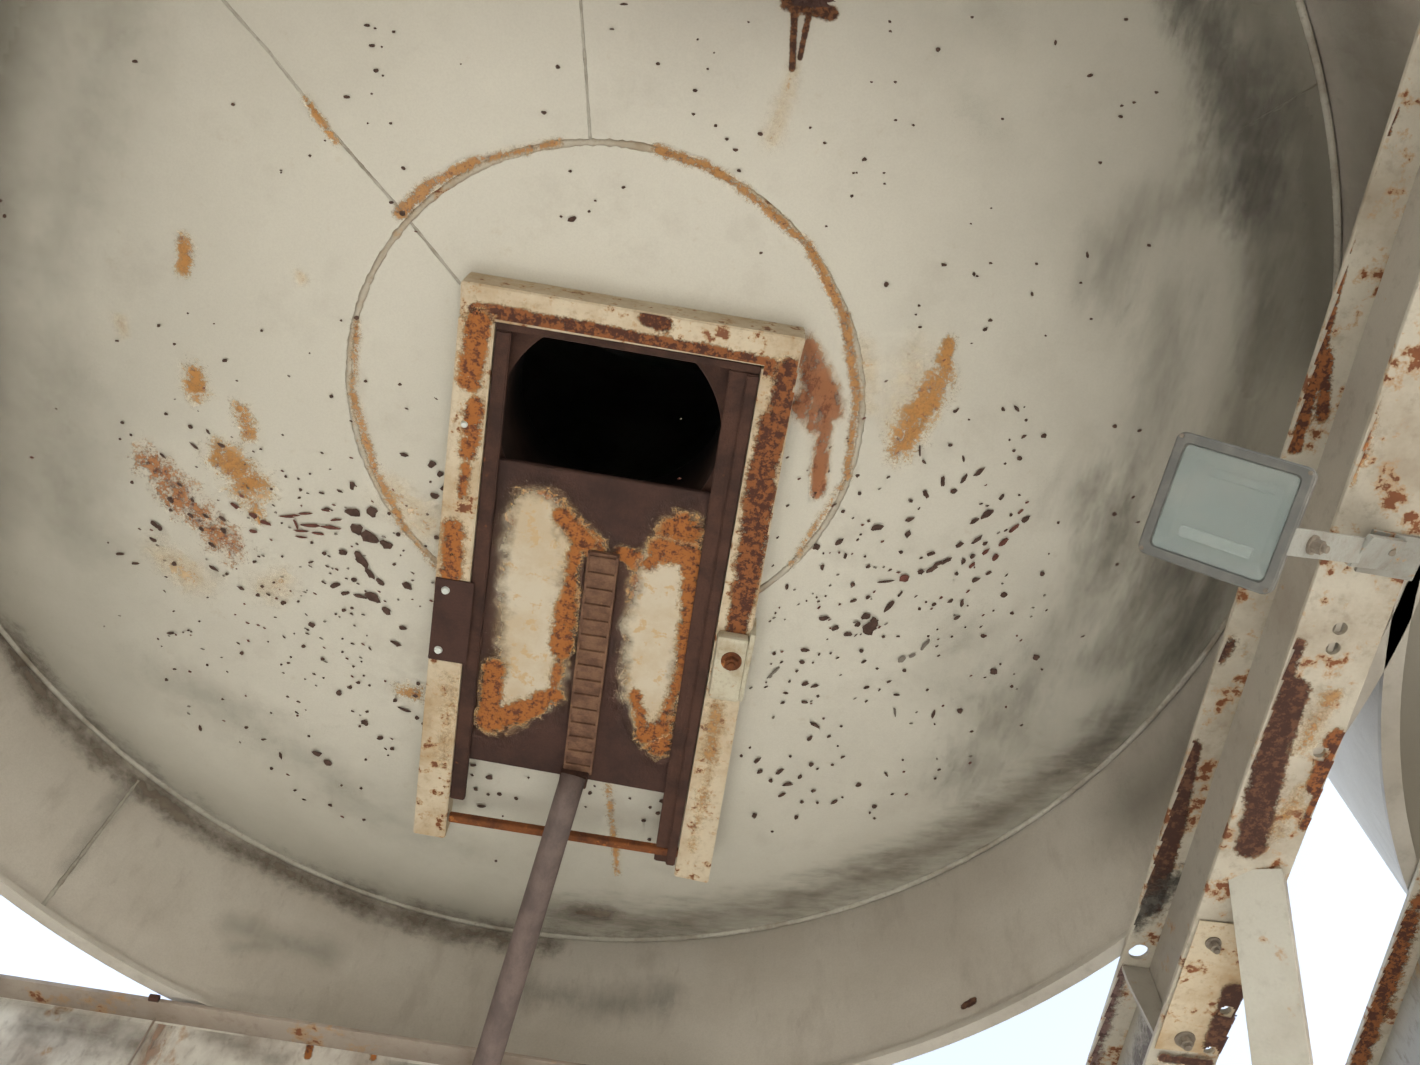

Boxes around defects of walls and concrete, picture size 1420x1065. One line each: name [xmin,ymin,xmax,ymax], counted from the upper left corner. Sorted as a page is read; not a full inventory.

rust [780,0,839,72]
rust [174,233,193,276]
rust [132,442,243,568]
rust [208,400,272,525]
rust [348,321,468,580]
rust [454,143,863,635]
rust [886,335,955,460]
rust [1287,241,1355,455]
rust [1218,635,1239,664]
rust [1140,739,1202,914]
rust [1233,638,1346,859]
rust [1350,891,1420,1065]